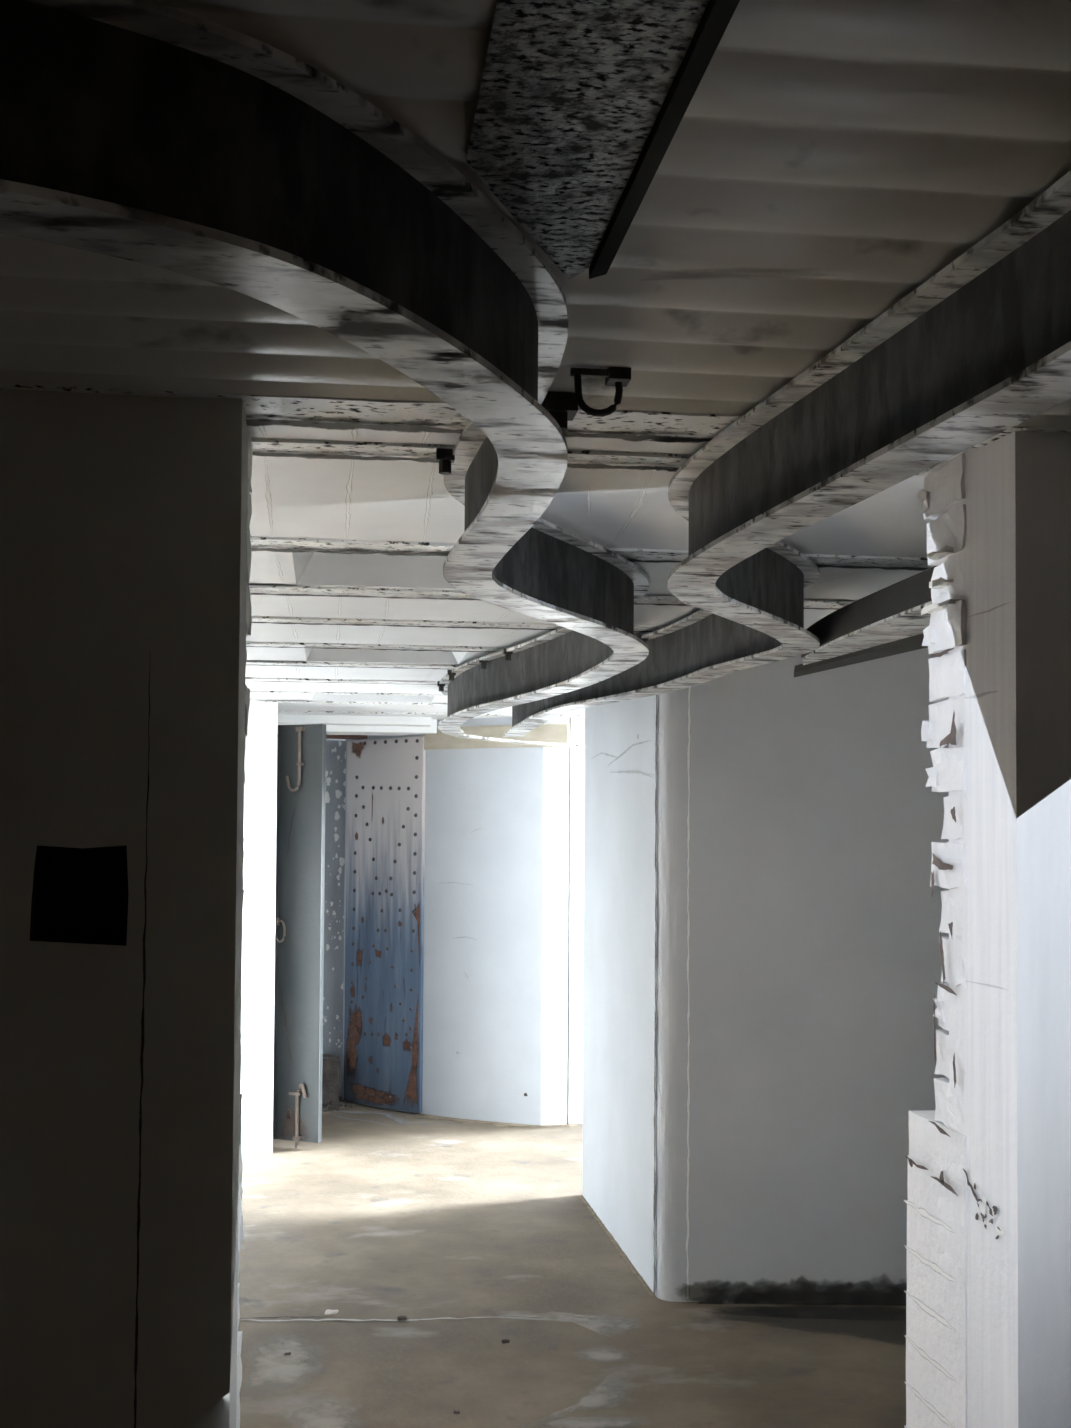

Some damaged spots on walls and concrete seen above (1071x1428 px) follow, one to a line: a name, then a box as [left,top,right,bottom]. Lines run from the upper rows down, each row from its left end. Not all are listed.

crack [929,648,954,657]
rust [352,742,364,757]
spalling [940,712,956,747]
spalling [931,853,953,900]
rust [398,904,420,964]
spalling [933,922,957,1067]
rust [346,984,418,1106]
crack [929,1121,950,1137]